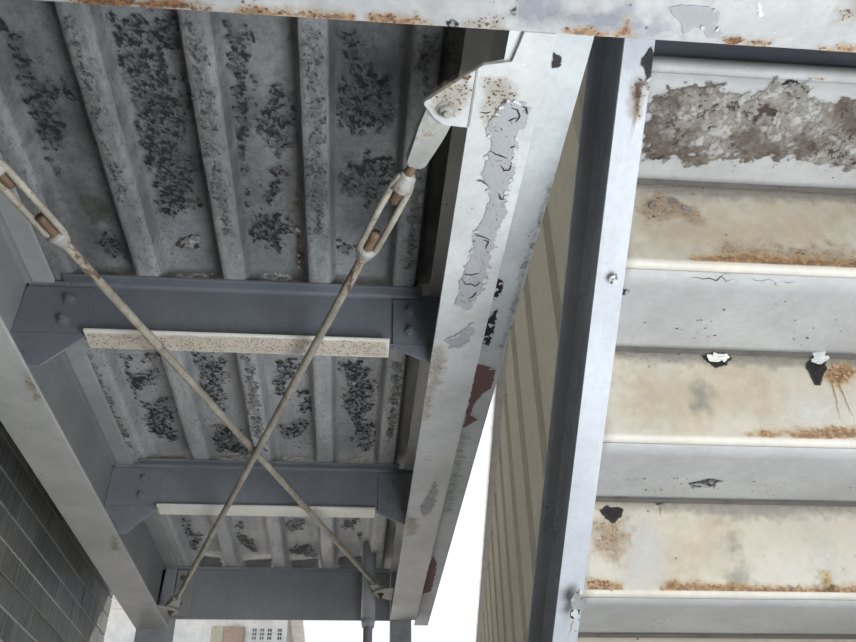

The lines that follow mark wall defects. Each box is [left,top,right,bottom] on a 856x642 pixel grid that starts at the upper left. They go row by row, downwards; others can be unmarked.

corrosion [234,4,356,21]
corrosion [368,13,432,25]
spalling [642,76,856,172]
peeling [455,99,531,310]
corrosion [691,243,856,268]
peeling [707,352,730,362]
peeling [811,351,829,364]
peeling [463,365,496,428]
corrosion [822,363,856,414]
corrosion [747,426,856,439]
peeling [688,479,722,489]
corrosion [660,571,856,593]